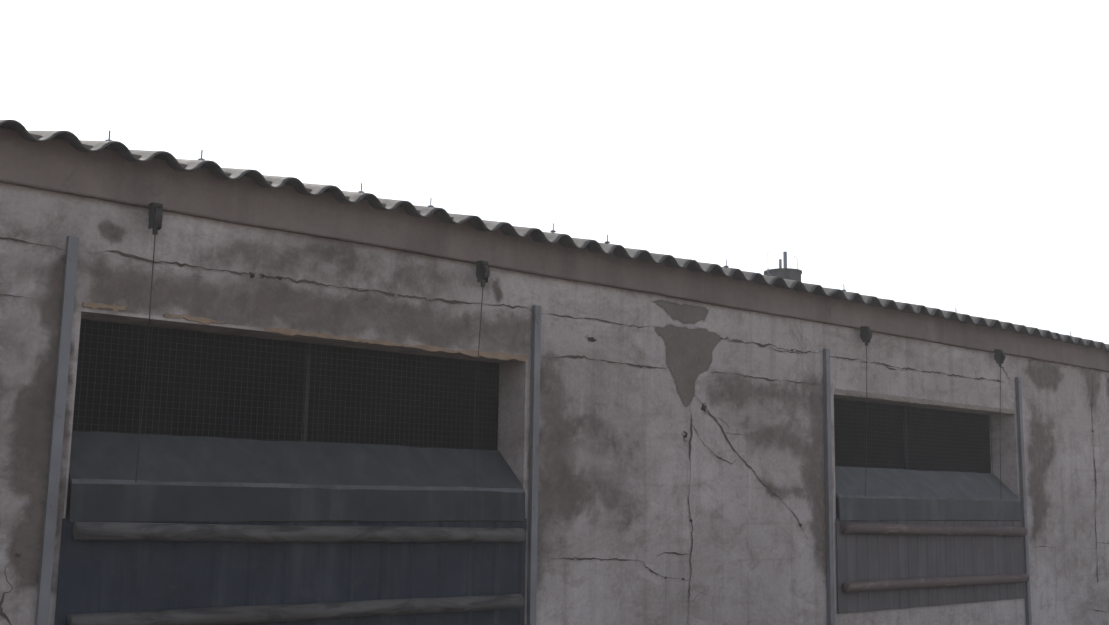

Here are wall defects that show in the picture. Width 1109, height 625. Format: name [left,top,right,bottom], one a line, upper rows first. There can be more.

crack [0,237,527,309]
crack [552,314,654,328]
crack [551,355,661,369]
crack [711,371,821,385]
crack [720,337,1010,382]
leakage [1028,415,1054,538]
crack [555,394,808,625]